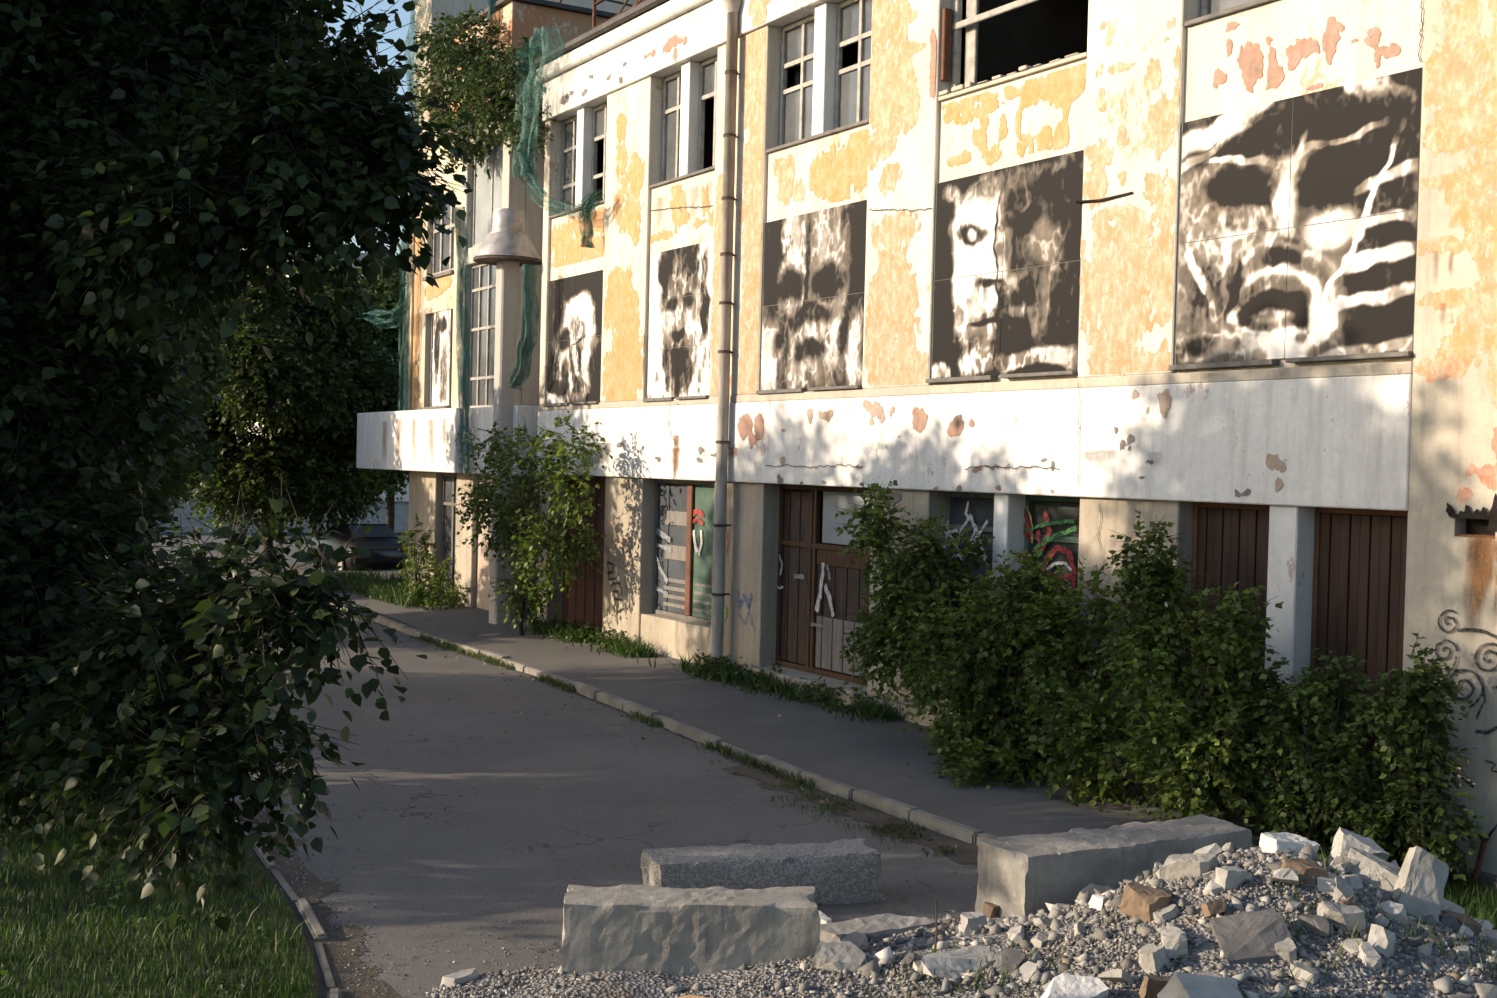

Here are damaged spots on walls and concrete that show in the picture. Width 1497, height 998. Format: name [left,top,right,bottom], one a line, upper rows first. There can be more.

peeling [1212,16,1401,93]
peeling [551,0,1180,425]
peeling [1413,0,1497,409]
peeling [737,413,785,449]
spalling [897,407,928,438]
spalling [947,415,974,437]
peeling [1454,427,1497,503]
corrosion [1468,536,1497,616]